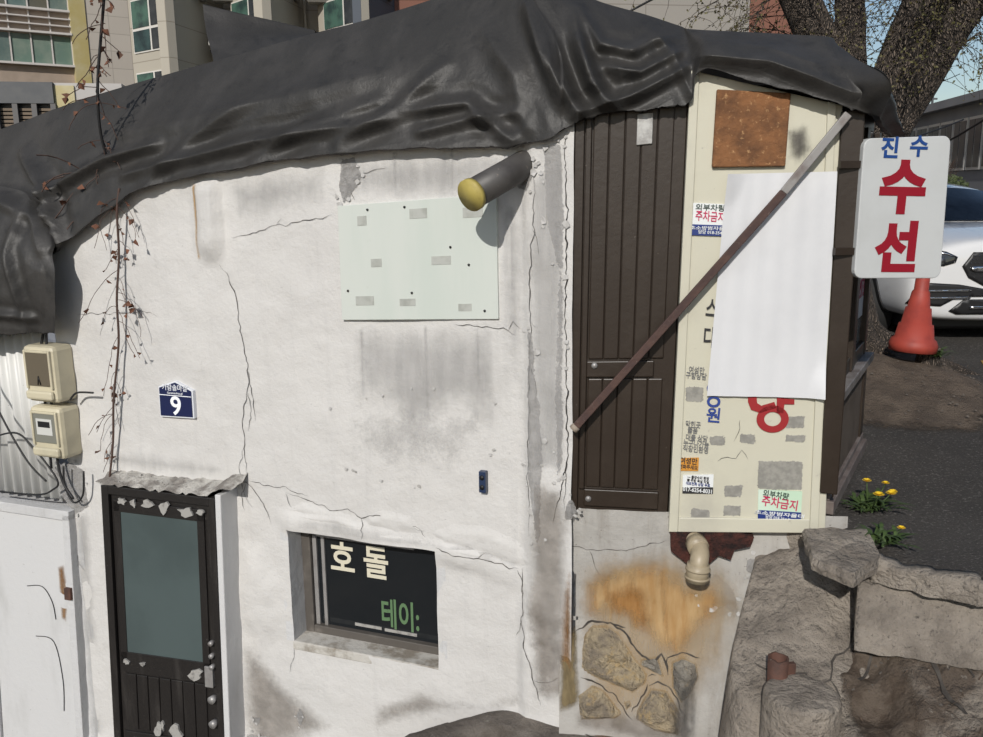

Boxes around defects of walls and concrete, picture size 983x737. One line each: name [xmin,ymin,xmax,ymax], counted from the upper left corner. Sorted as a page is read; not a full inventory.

crack [227,274,380,539]
spalling [335,153,365,206]
crack [456,178,539,408]
crack [554,139,569,518]
rust [592,569,724,703]